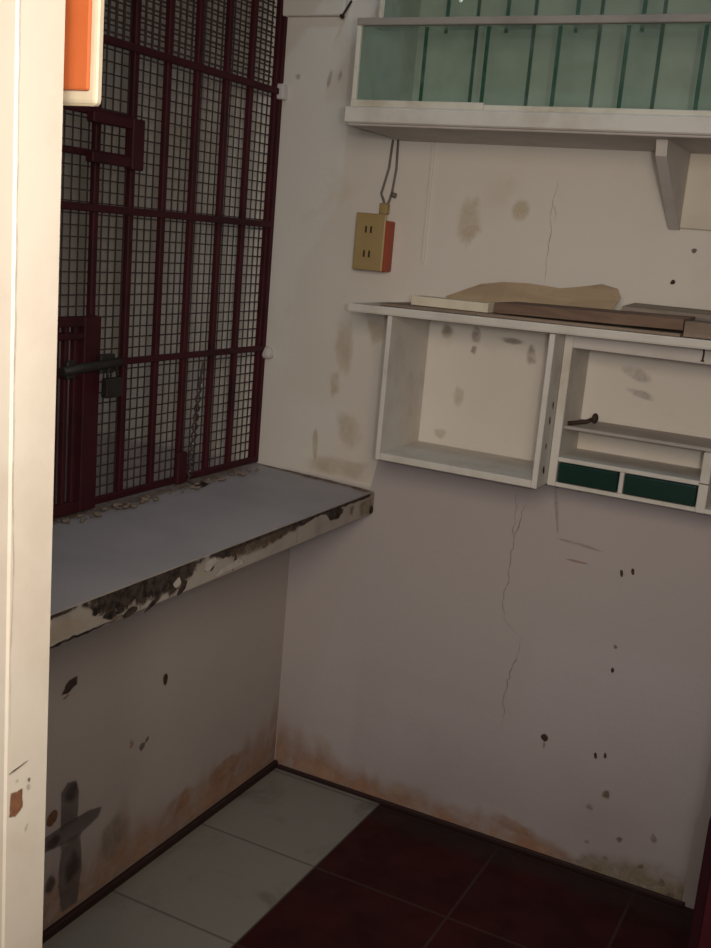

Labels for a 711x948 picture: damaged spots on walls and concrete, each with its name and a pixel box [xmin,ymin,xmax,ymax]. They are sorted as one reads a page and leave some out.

spalling [50,494,370,649]
leakage [43,739,456,930]
leakage [508,828,563,857]
leakage [579,858,684,901]